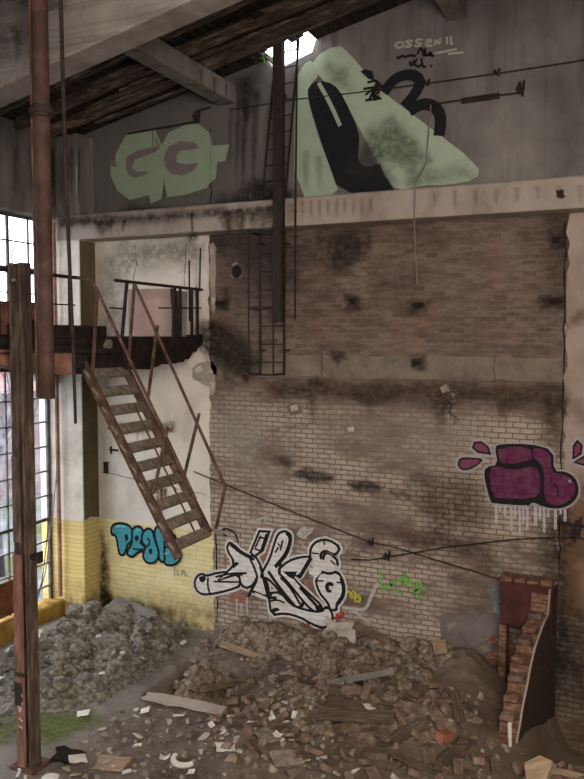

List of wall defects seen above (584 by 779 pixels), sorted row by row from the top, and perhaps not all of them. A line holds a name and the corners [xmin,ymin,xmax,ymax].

flaking render [191,360,217,396]
leakage [272,379,564,410]